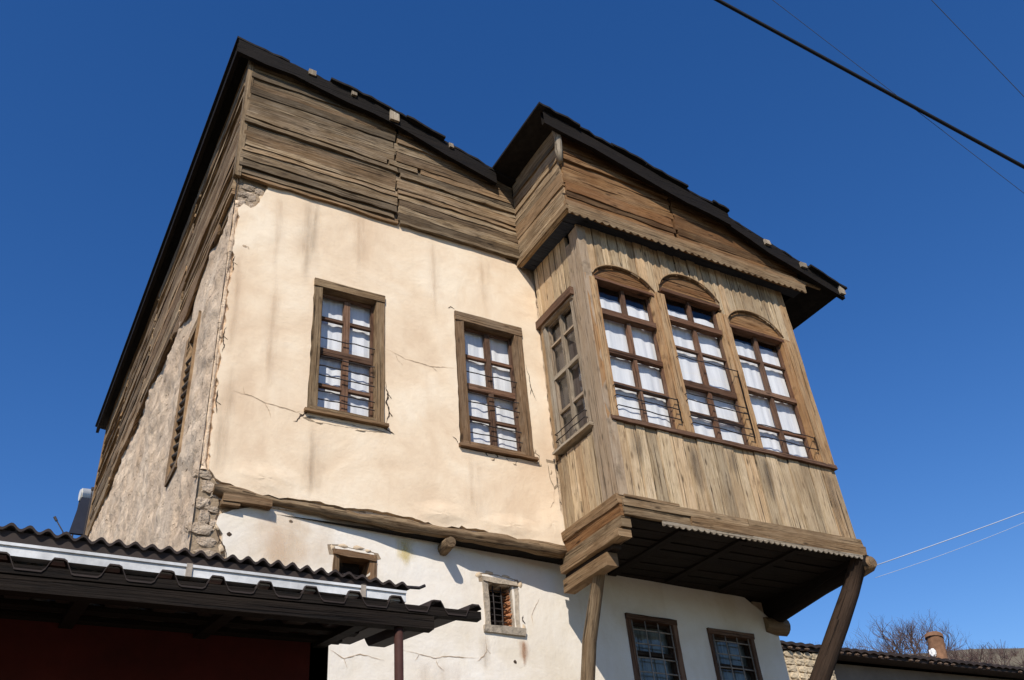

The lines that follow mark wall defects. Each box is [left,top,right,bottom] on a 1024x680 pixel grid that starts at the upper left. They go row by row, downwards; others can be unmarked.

flaking render [233,178,266,208]
crack [216,388,306,421]
flaking render [184,463,224,556]
crack [409,637,491,671]